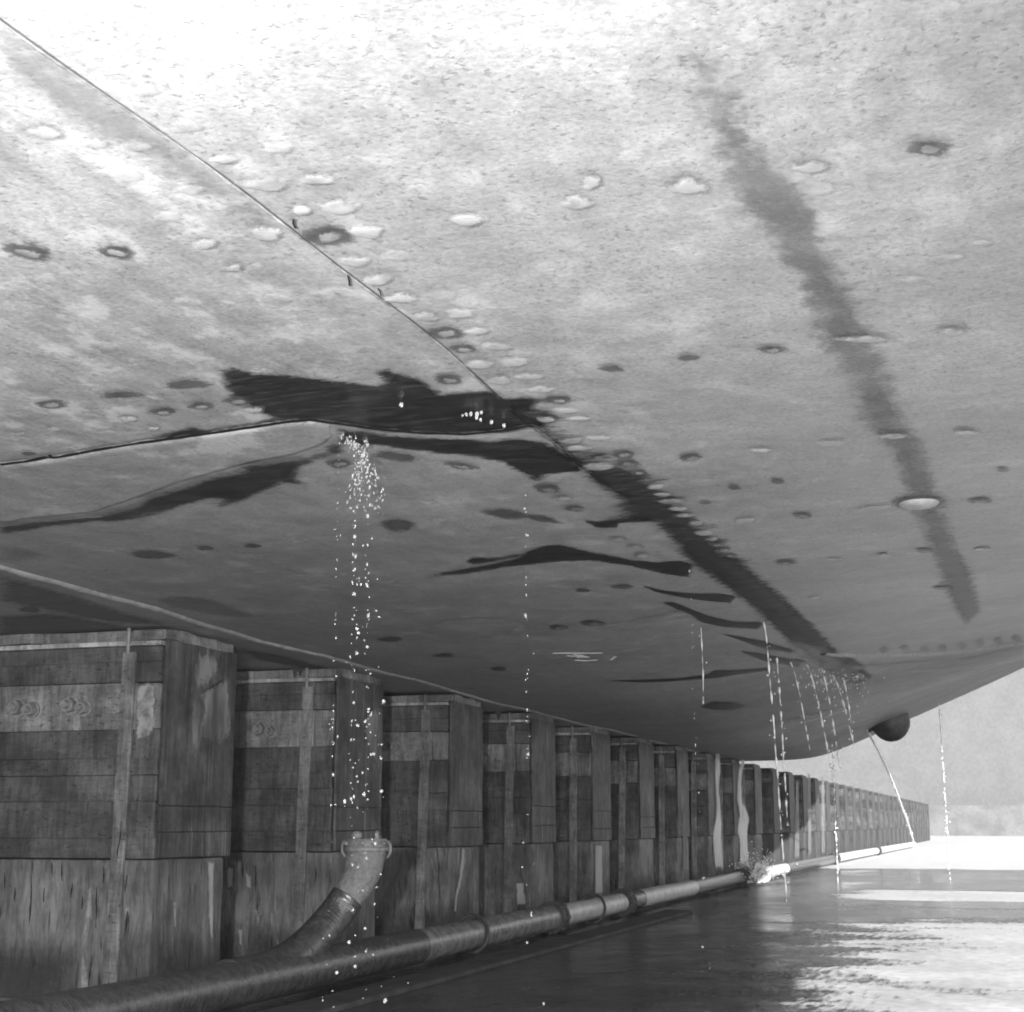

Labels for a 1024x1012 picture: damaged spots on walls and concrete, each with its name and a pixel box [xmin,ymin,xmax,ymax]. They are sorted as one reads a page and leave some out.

crack [0,408,630,522]
leakage [0,368,864,911]